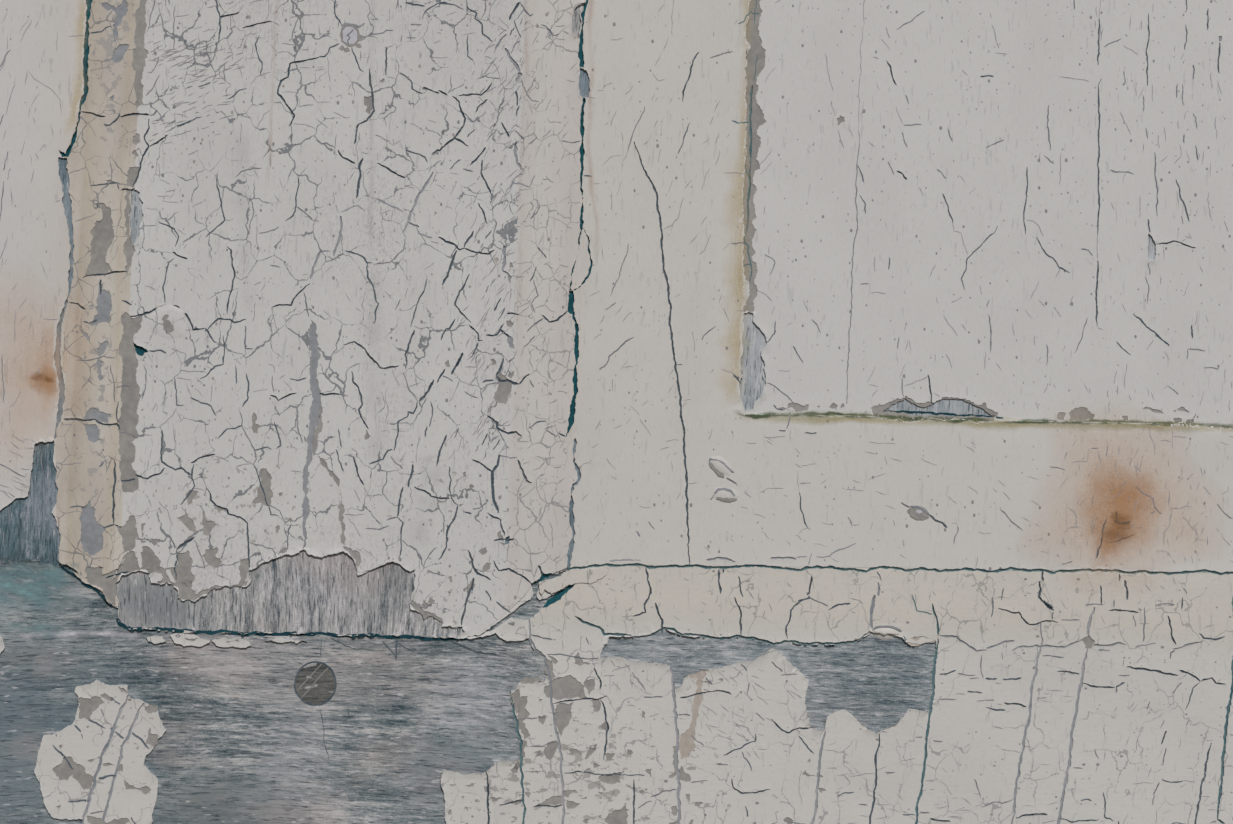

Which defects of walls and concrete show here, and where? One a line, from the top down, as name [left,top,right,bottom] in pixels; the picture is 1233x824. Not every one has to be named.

crack [0,13,62,216]
spalling [101,0,149,107]
peeling [739,0,767,410]
spalling [83,133,148,493]
crack [61,0,580,626]
peeling [871,396,998,423]
spalling [1057,407,1094,422]
spalling [1143,407,1194,424]
peeling [0,320,936,824]